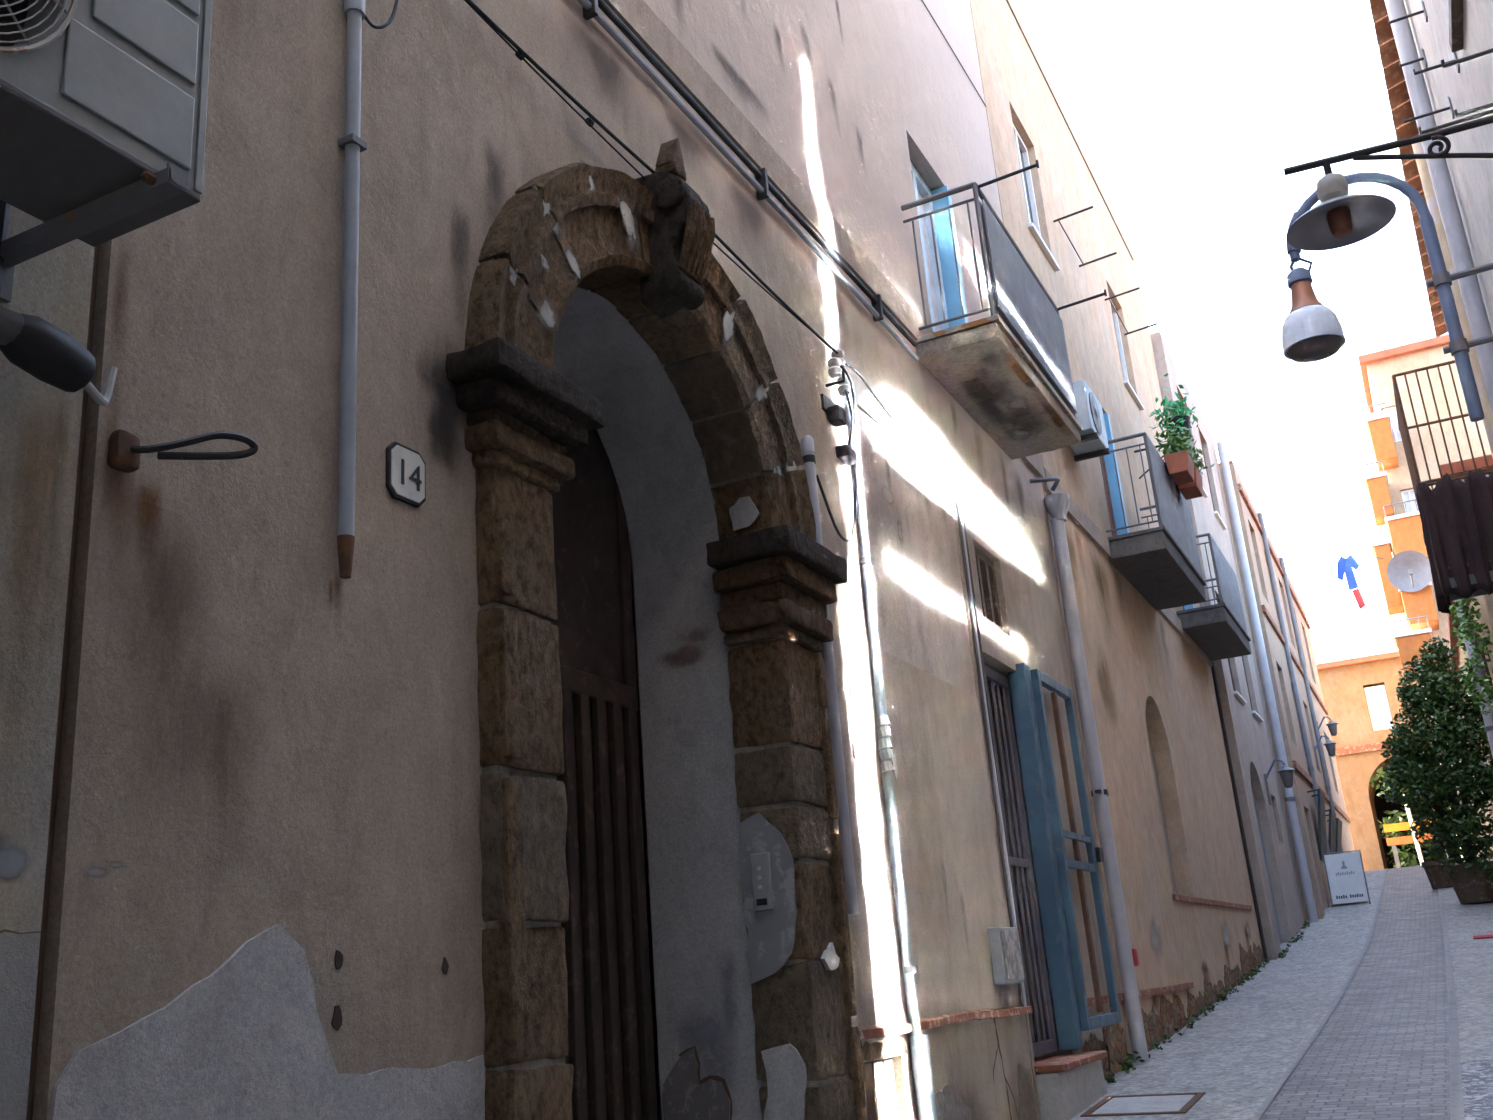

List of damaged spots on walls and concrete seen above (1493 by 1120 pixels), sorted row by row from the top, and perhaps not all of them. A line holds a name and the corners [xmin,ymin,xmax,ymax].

spalling [335,950,343,969]
spalling [331,1005,342,1031]
flaking render [662,1046,732,1120]